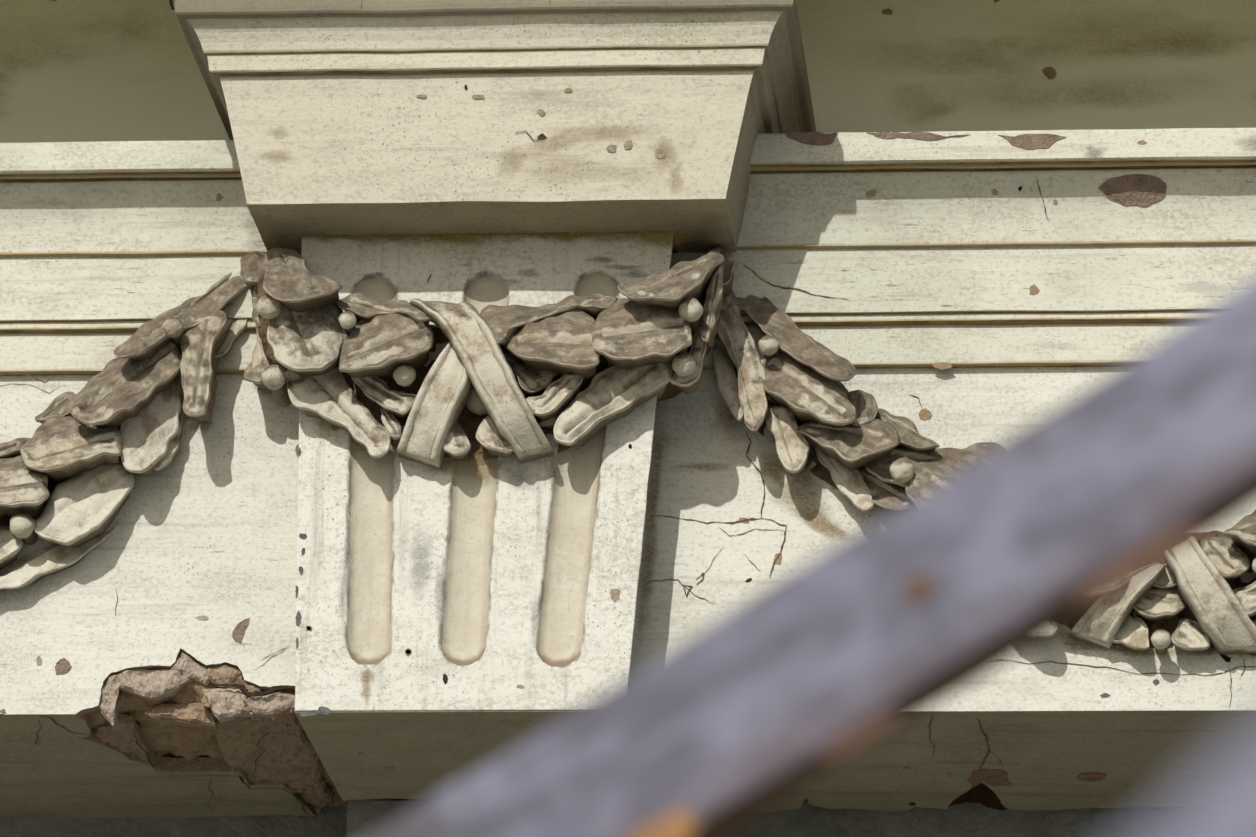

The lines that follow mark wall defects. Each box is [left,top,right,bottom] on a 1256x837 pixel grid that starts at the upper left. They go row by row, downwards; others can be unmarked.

peeling [1098,174,1167,207]
crack [743,264,849,300]
crack [648,431,787,603]
spalling [88,650,356,819]
crack [978,720,1004,772]